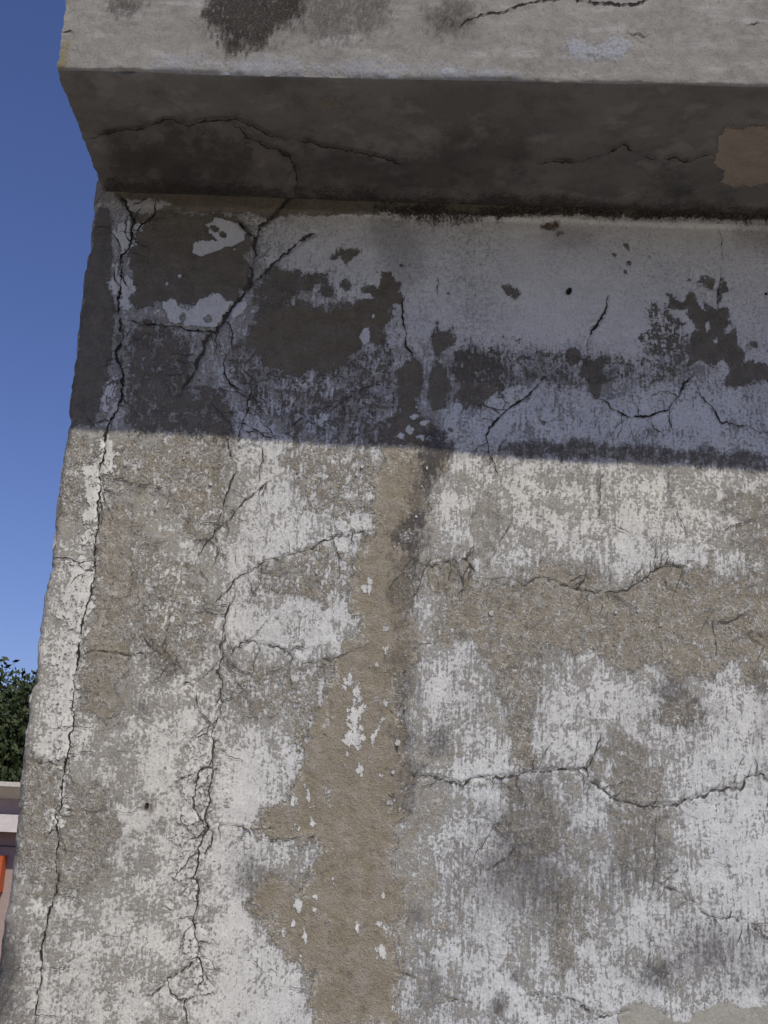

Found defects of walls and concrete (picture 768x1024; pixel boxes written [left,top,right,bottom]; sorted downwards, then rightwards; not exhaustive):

water stain [200,0,304,55]
crack [441,0,649,42]
crack [396,295,413,356]
crack [6,118,407,1024]
peeling [56,179,768,1024]
crack [389,375,768,661]
crack [413,736,768,966]